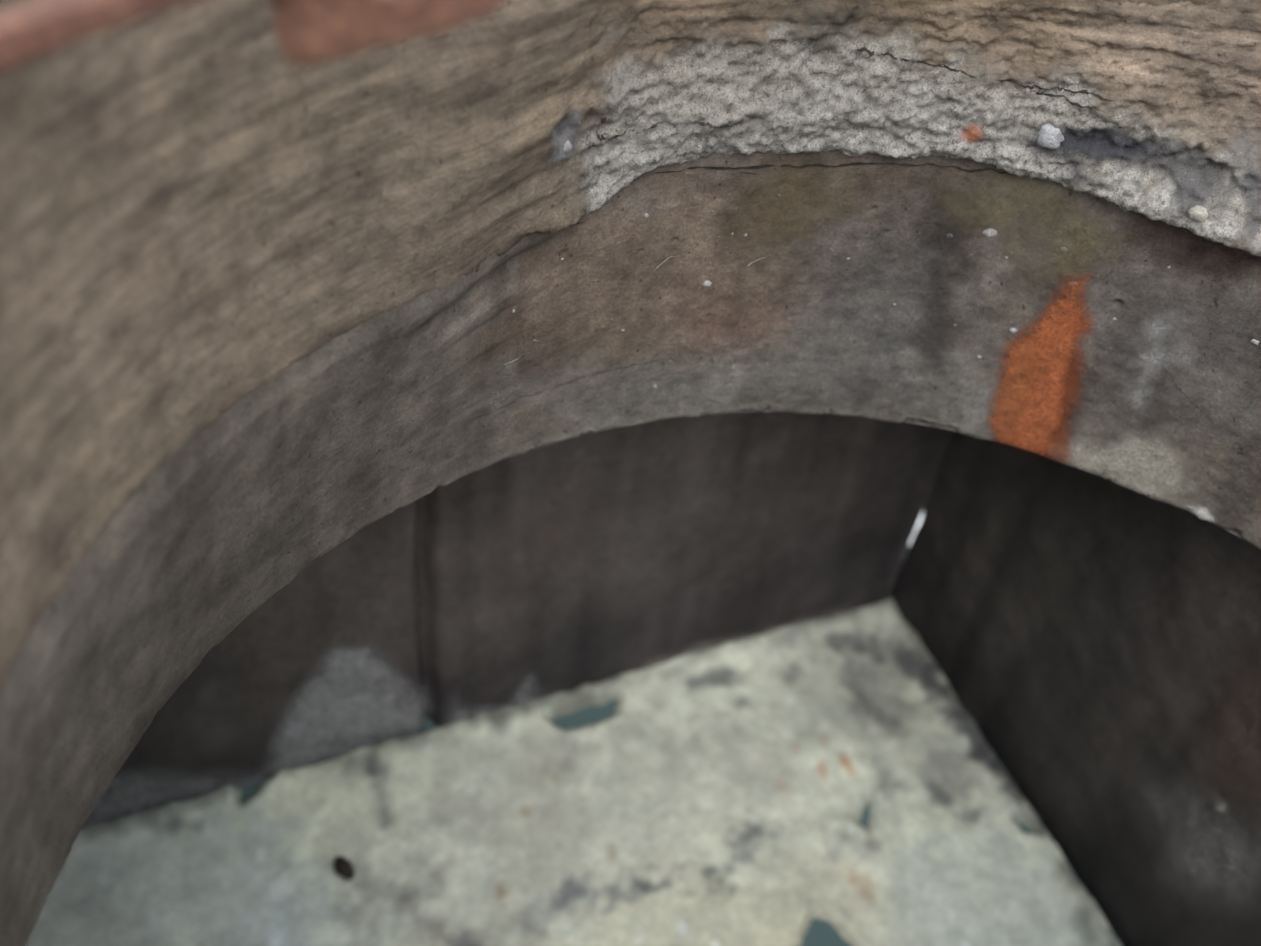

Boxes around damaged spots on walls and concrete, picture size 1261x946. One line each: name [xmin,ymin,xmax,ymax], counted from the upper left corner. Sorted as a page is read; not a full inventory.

crack [596,116,1010,178]
damp [576,9,1261,276]
crack [838,5,1114,112]
corrosion [990,276,1090,458]